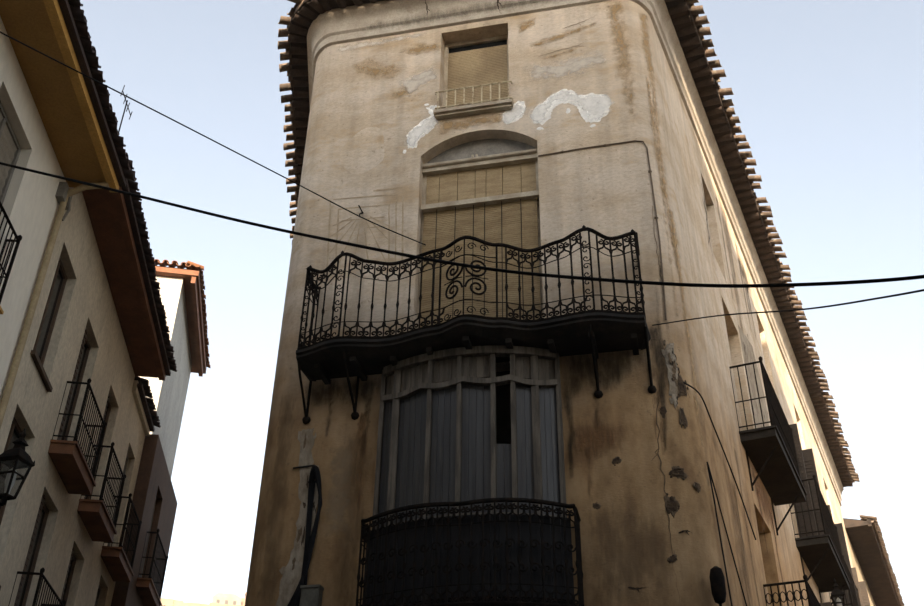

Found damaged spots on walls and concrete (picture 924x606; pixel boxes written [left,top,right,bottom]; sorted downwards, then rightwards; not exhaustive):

peeling [659,339,689,429]
peeling [275,428,320,606]
flaking render [663,493,680,518]
flaking render [669,466,701,493]